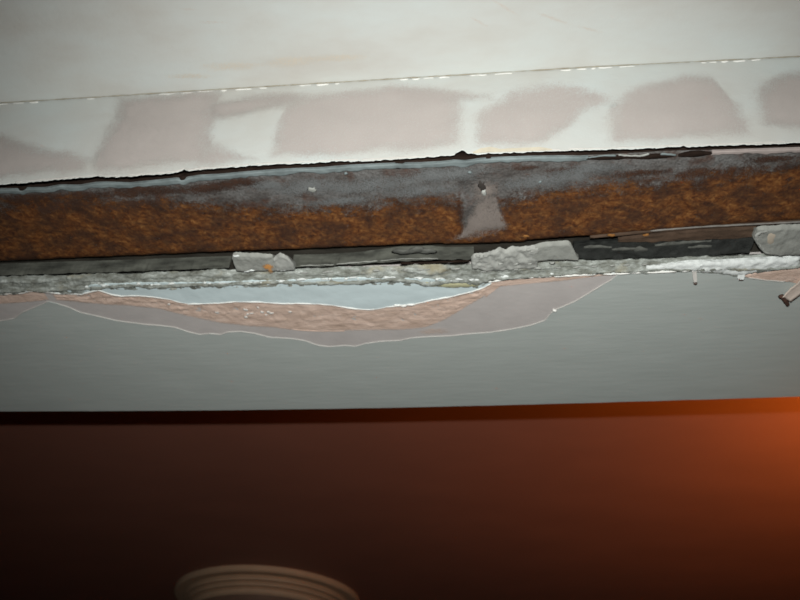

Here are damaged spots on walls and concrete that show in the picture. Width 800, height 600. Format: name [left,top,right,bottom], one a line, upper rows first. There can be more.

corrosion [0,155,800,261]
peeling [0,245,800,347]